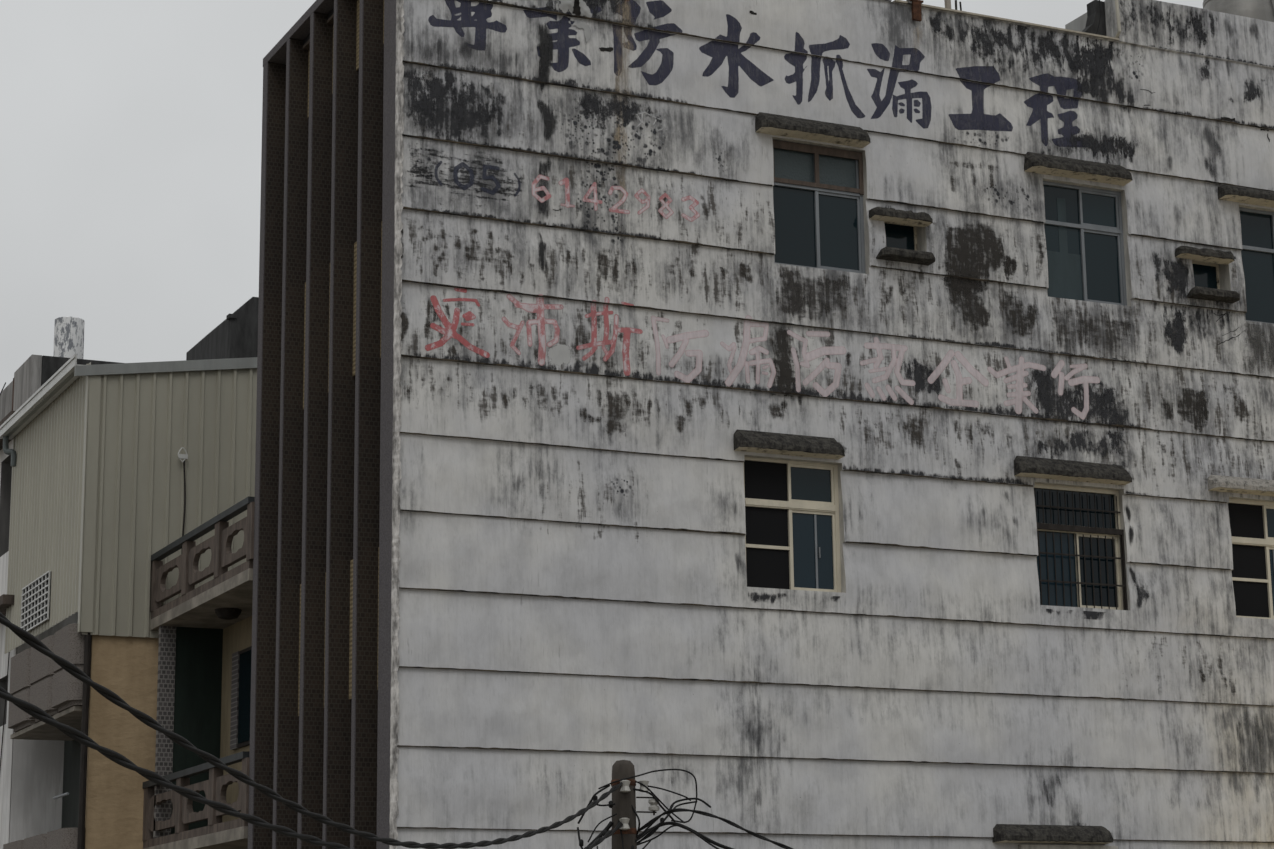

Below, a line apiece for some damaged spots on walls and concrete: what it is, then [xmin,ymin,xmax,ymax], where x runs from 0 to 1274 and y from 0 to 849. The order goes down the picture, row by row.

water stain [532,0,655,29]
water stain [403,26,695,281]
water stain [740,264,752,282]
water stain [776,269,850,320]
water stain [908,308,1136,362]
water stain [414,327,1143,469]
water stain [1126,491,1146,542]
water stain [1129,568,1149,607]
water stain [1046,609,1103,620]
water stain [1237,709,1272,777]